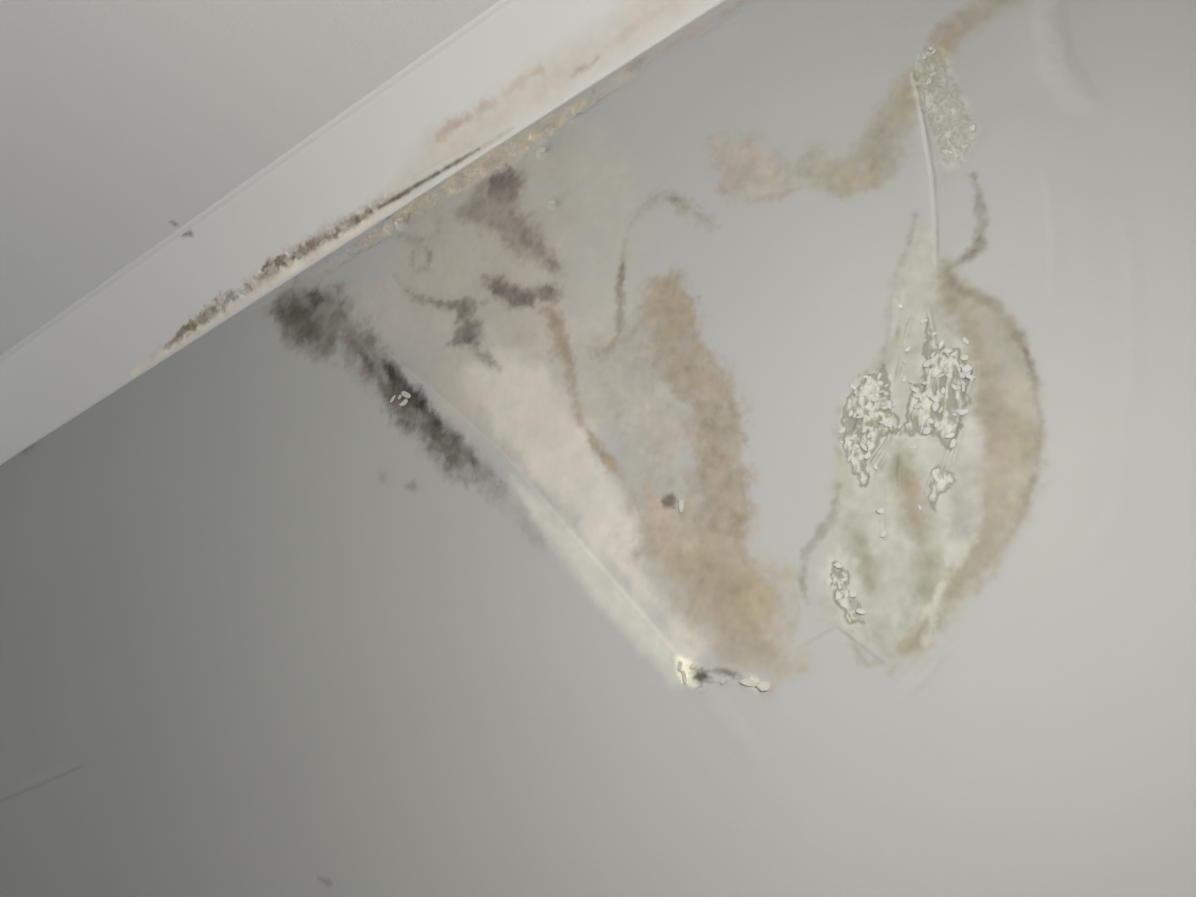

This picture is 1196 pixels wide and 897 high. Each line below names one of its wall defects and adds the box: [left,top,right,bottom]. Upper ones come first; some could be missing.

peeling [128,191,404,377]
damp [259,0,1055,705]
peeling [835,308,986,490]
peeling [821,552,874,639]